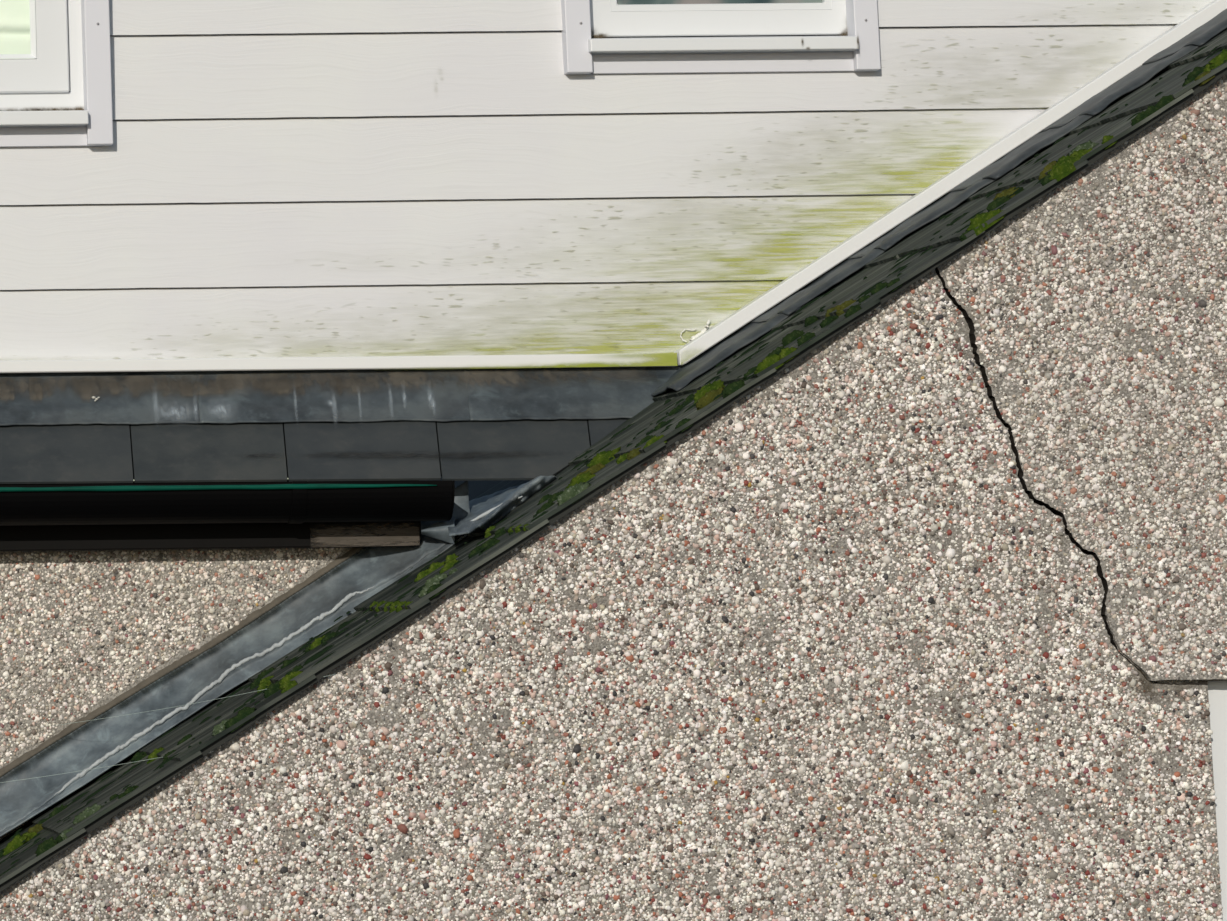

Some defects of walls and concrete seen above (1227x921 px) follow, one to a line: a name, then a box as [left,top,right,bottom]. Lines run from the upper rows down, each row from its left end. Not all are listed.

crack [935,267,1208,685]